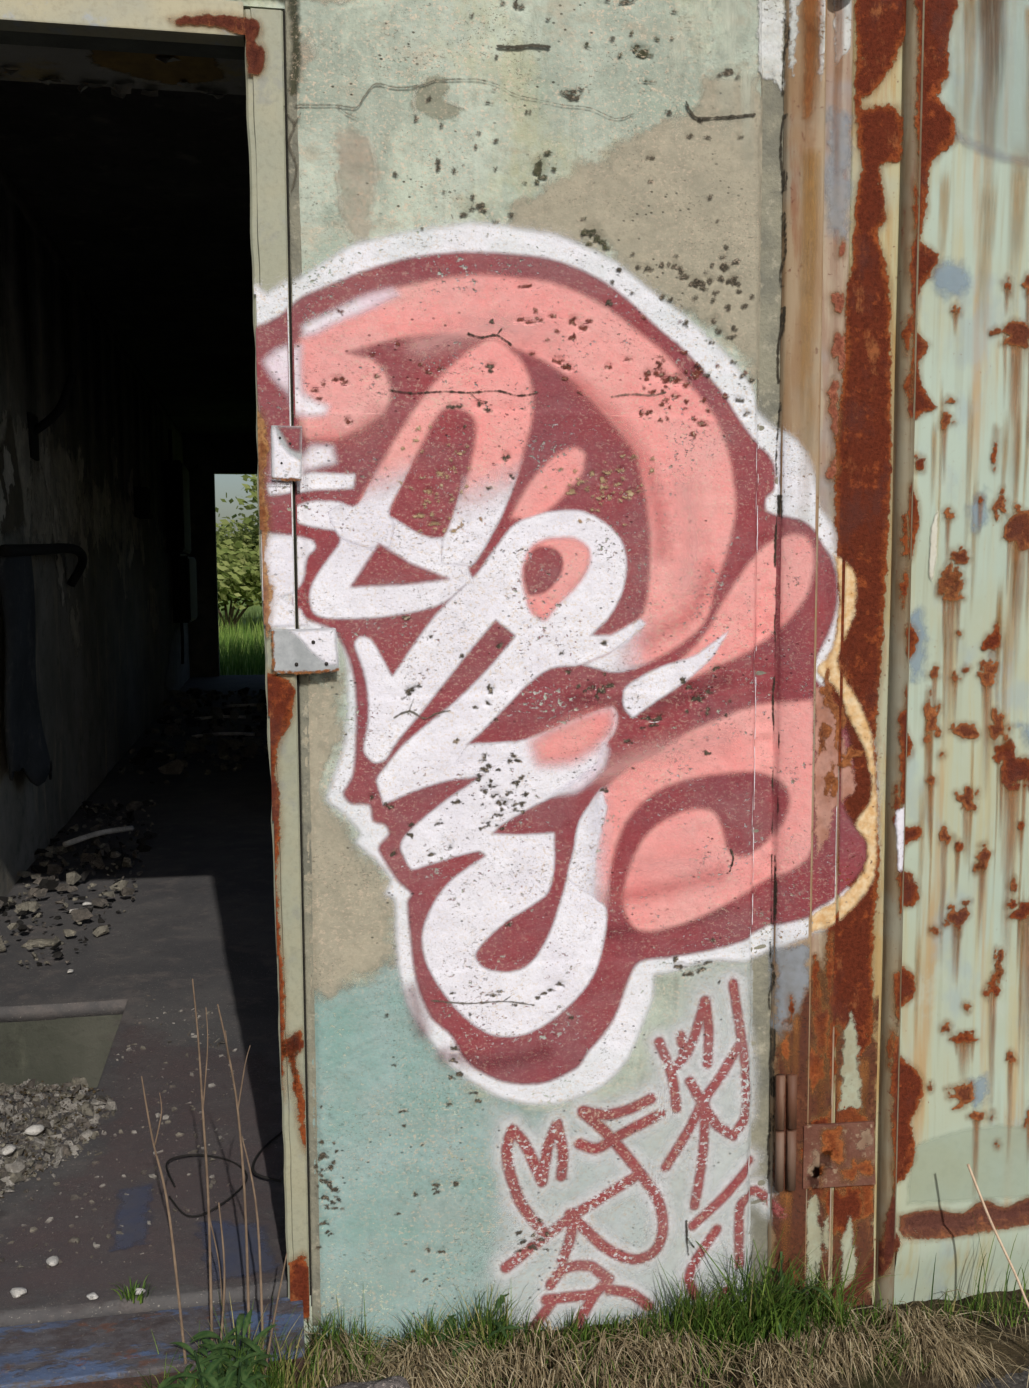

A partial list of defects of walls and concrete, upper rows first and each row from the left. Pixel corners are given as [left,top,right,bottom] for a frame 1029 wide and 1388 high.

rust [169,13,266,75]
spalling [610,31,674,58]
spalling [781,19,790,95]
spalling [780,114,788,193]
peeling [460,68,763,438]
spalling [777,306,786,383]
spalling [774,495,783,568]
rust [771,0,1029,1311]
spalling [772,677,780,748]
rust [257,411,339,1148]
spalling [767,1028,776,1179]
rust [288,1254,310,1319]